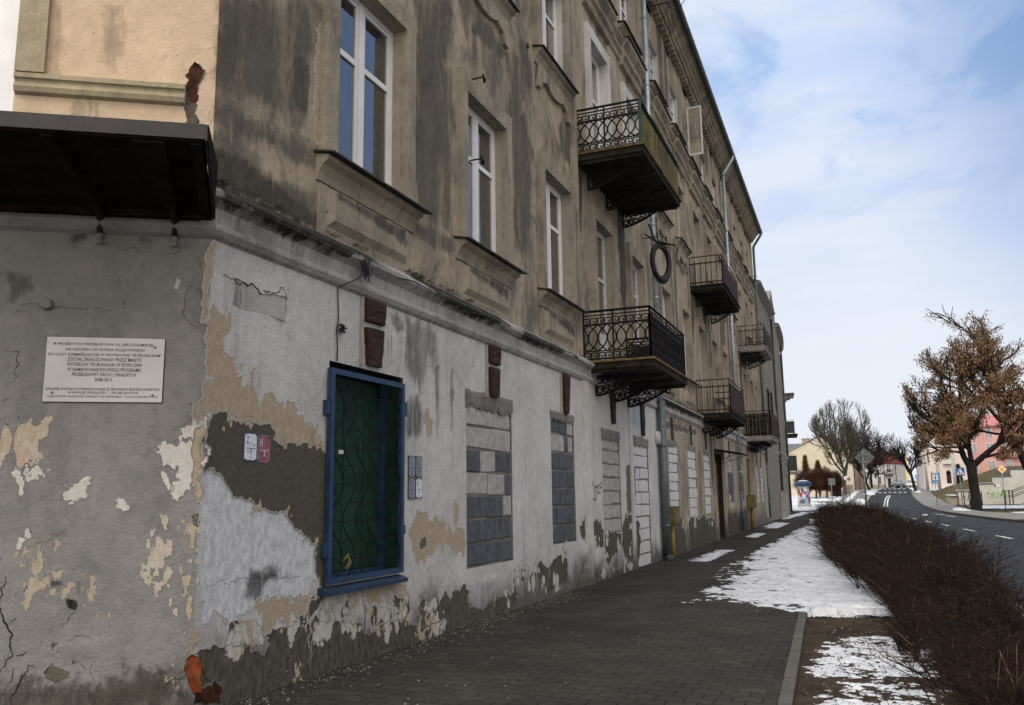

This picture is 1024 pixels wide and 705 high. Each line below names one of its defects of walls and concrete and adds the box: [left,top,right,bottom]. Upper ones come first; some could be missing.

spalling [184,63,206,124]
damp [217,108,312,163]
damp [217,1,315,120]
damp [472,12,534,252]
damp [215,149,317,230]
peeling [0,414,55,497]
peeling [61,475,93,506]
peeling [140,241,641,705]
crack [0,575,35,700]